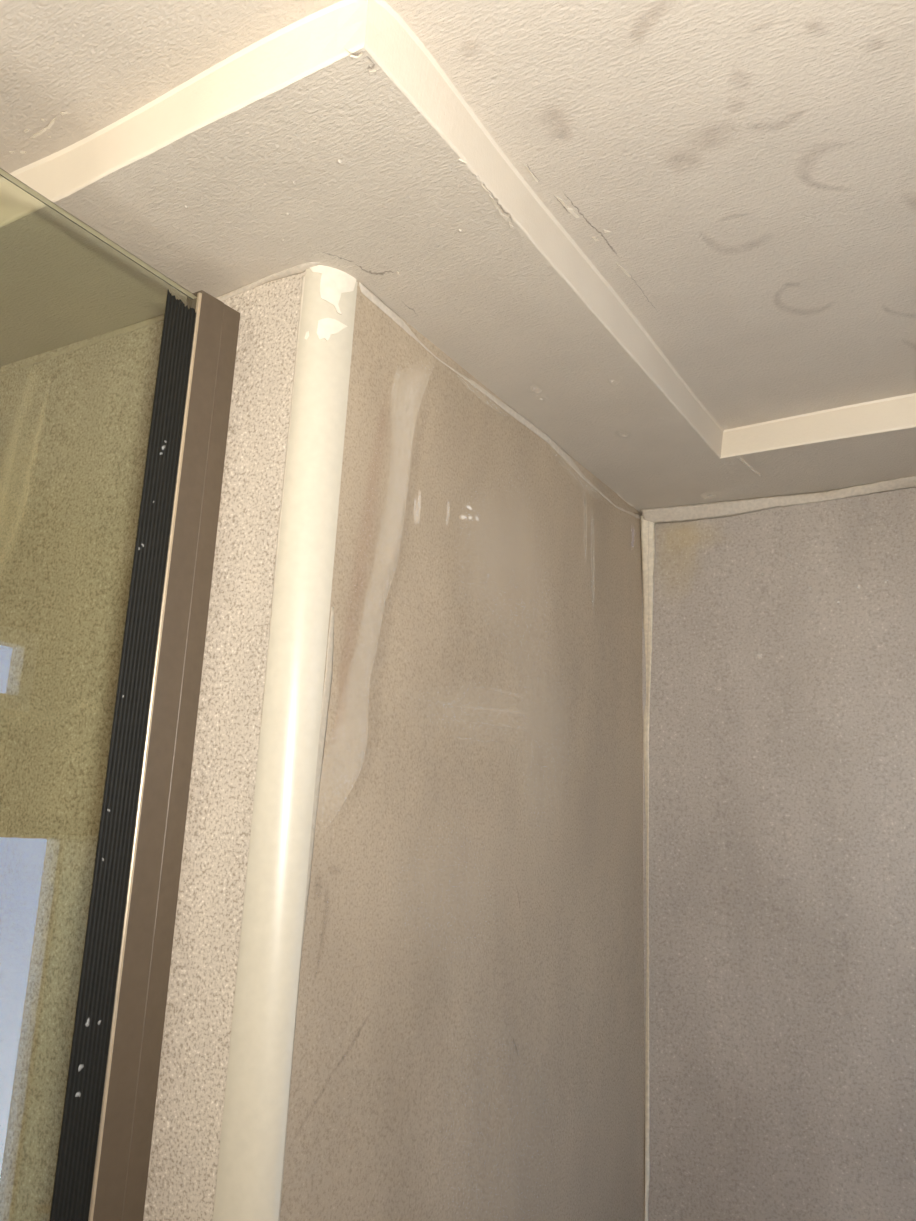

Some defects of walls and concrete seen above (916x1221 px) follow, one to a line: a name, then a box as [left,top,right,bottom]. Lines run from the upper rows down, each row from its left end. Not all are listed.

peeling [305,265,357,341]